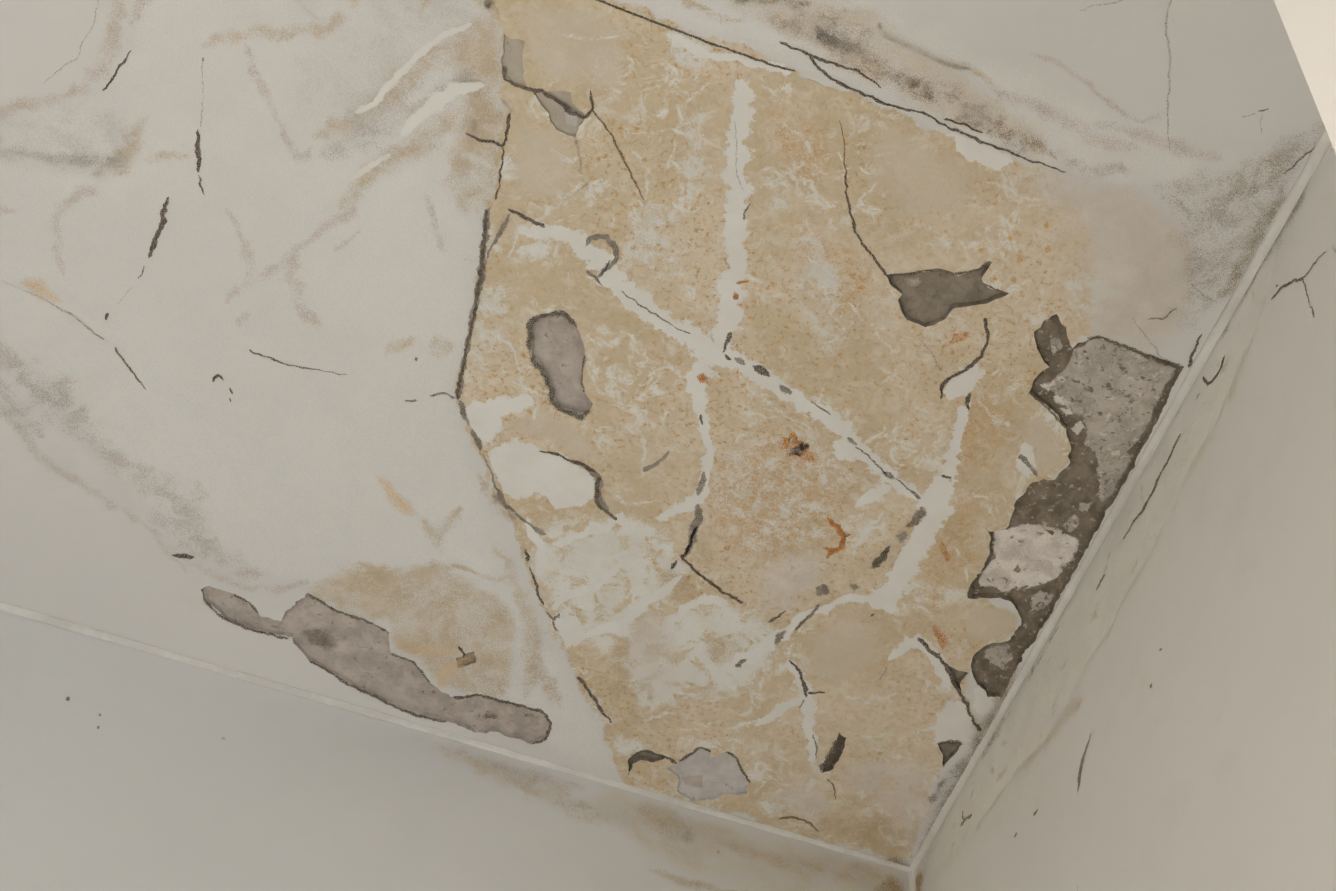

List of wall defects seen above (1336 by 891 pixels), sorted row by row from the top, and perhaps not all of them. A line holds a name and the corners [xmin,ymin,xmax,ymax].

crack [194,60,205,195]
crack [597,0,1066,173]
damp [620,0,1325,330]
crack [5,197,169,390]
crack [405,66,644,631]
damp [0,0,1058,891]
crack [585,234,691,334]
peeling [453,0,1201,862]
crack [921,318,990,410]
crack [670,332,951,800]
flaking render [201,586,552,744]
crack [917,638,981,732]